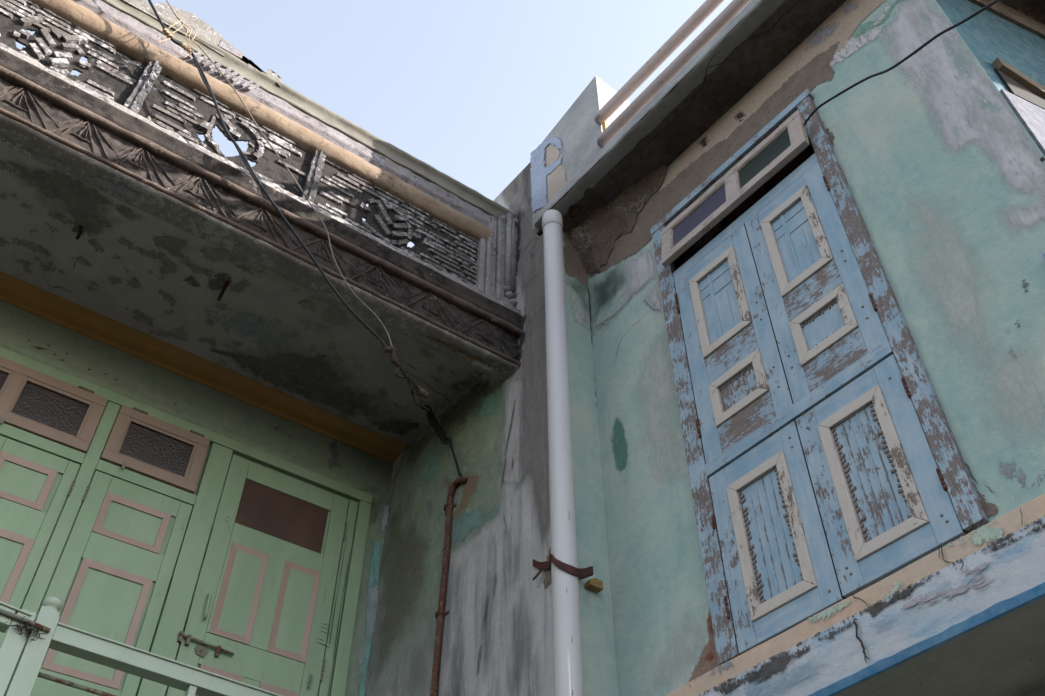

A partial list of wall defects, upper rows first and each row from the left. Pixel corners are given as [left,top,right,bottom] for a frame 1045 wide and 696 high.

peeling [0,159,255,328]
peeling [545,144,568,201]
peeling [563,0,1045,309]
leakage [368,372,505,696]
flaking render [688,609,734,687]
crack [852,594,869,663]